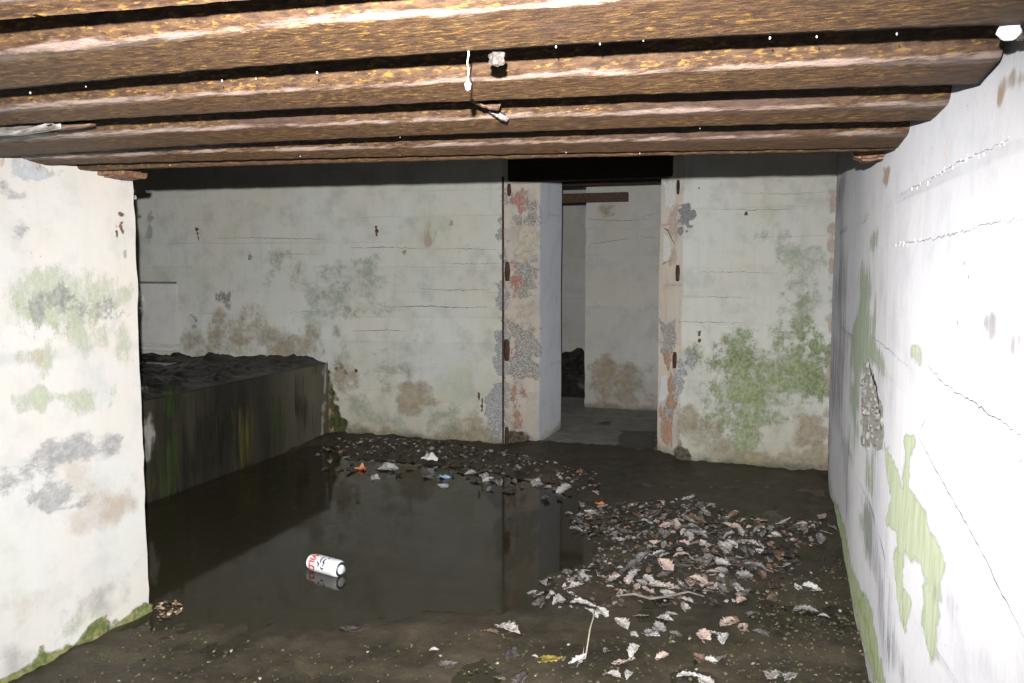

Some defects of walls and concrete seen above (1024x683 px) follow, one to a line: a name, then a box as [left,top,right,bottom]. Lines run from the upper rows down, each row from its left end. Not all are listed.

peeling [662,181,696,262]
mould [29,281,121,326]
leakage [189,292,256,352]
leakage [262,326,318,356]
leakage [437,419,497,444]
spalling [484,198,542,441]
spalling [659,319,697,419]
spalling [860,359,884,451]
crack [873,337,1022,436]
leakage [2,435,121,512]
crack [920,423,1024,637]
leakage [894,549,911,631]